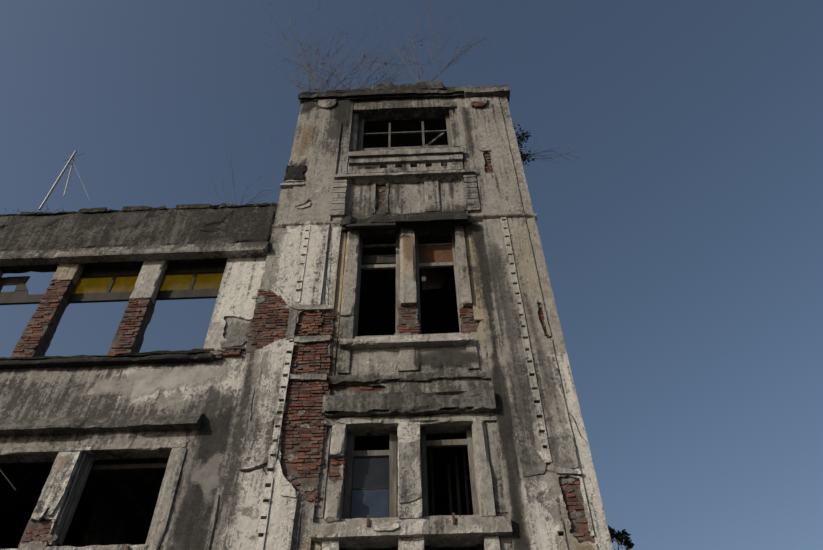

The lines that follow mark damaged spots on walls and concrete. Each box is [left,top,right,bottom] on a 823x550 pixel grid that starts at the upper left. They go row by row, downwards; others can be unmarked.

flaking render [479,147,494,173]
flaking render [193,284,385,507]
leakage [472,224,530,550]
flaking render [537,303,549,339]
leakage [175,408,232,550]
flaking render [517,435,595,544]